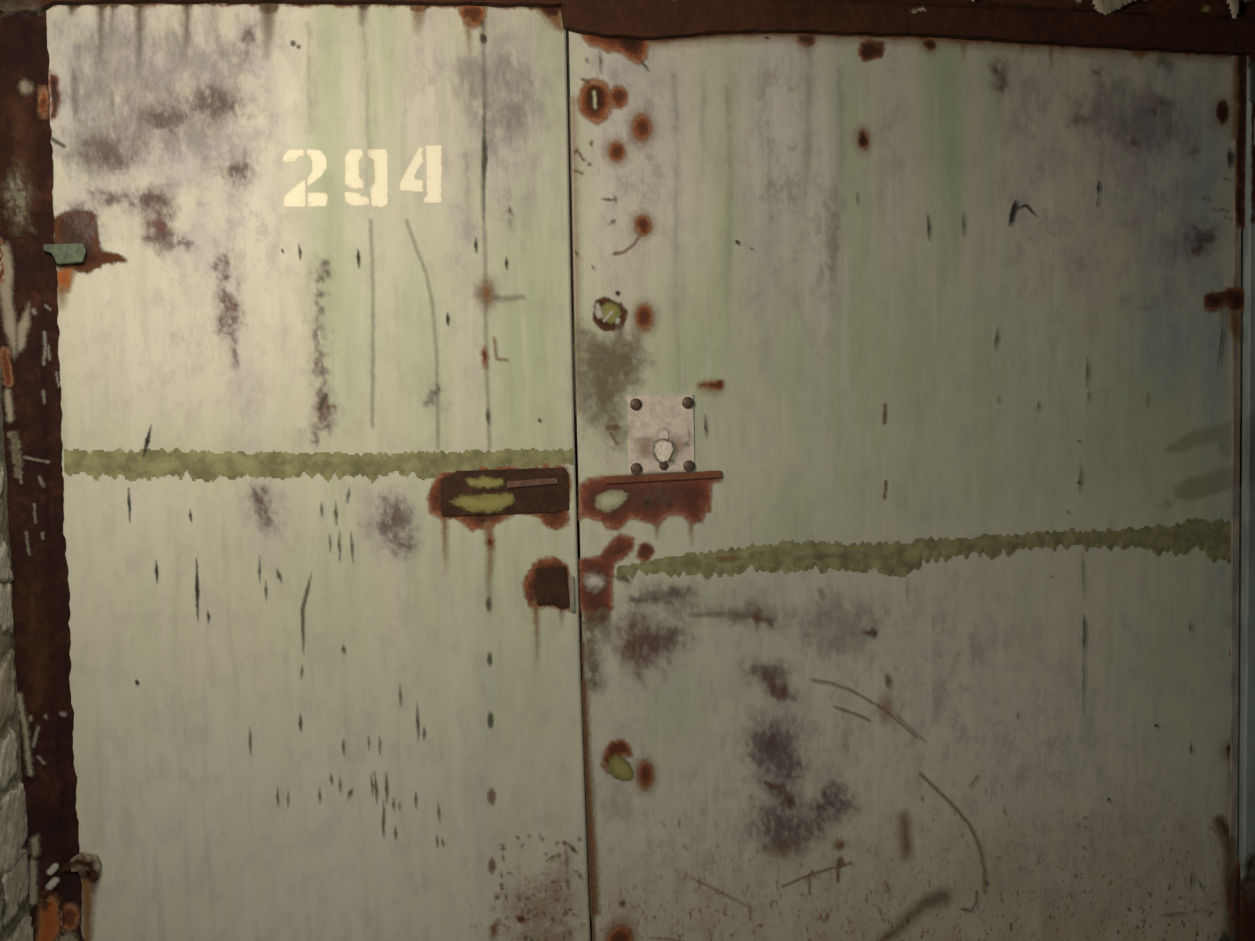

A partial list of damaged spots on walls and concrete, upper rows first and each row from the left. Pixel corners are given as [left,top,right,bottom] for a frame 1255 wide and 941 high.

corrosion [5,74,61,227]
corrosion [54,204,126,296]
corrosion [593,291,653,331]
corrosion [1204,287,1244,341]
corrosion [428,463,722,941]
corrosion [36,871,99,941]